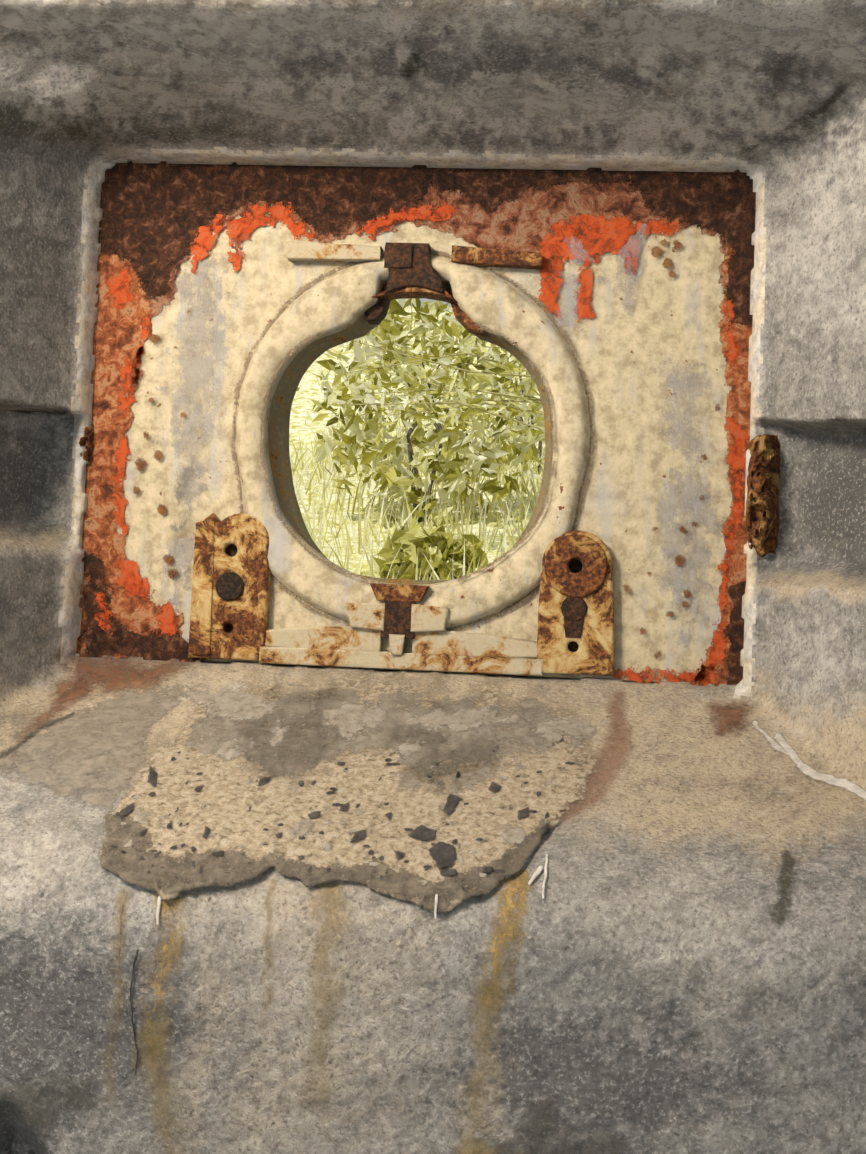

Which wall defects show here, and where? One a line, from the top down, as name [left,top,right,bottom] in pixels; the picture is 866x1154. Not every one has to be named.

rust [651,239,682,277]
peeling [77,161,756,687]
rust [135,450,163,471]
rust [163,554,178,579]
rust [666,590,691,617]
spalling [0,669,608,913]